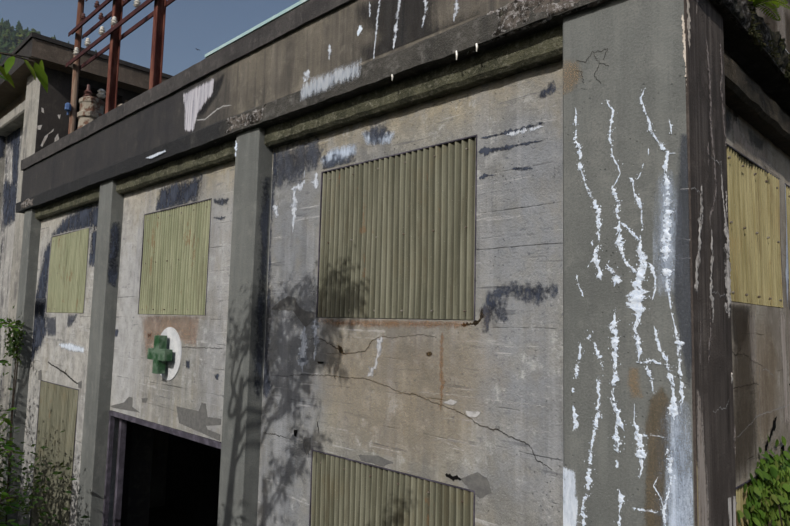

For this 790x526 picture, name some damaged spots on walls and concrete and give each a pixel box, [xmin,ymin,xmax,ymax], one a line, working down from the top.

water stain [183,75,224,132]
water stain [301,65,358,97]
water stain [357,0,439,61]
spalling [466,0,606,55]
crack [576,48,609,84]
spalling [681,0,691,87]
spalling [715,0,790,86]
water stain [478,122,543,157]
water stain [483,281,558,332]
water stain [563,44,775,526]
crack [310,334,437,355]
crack [289,374,552,470]